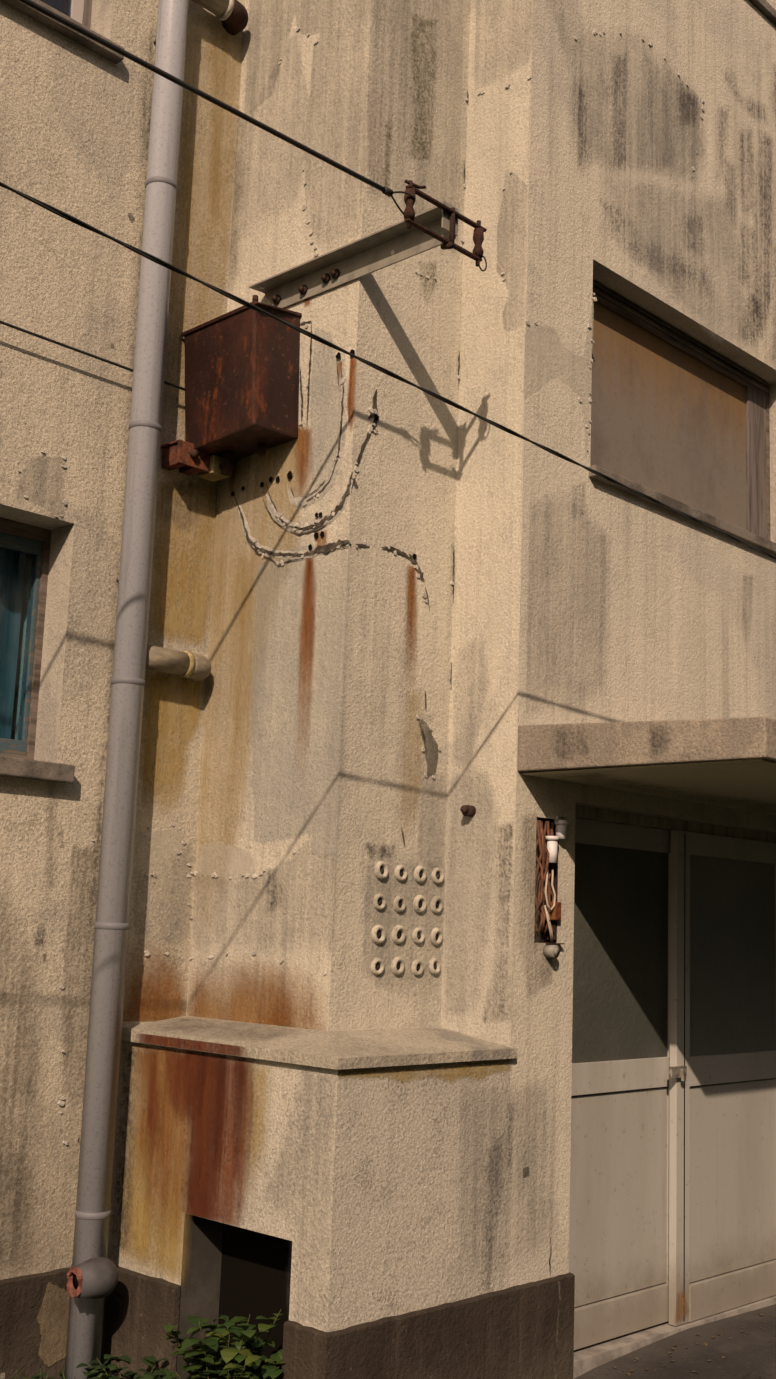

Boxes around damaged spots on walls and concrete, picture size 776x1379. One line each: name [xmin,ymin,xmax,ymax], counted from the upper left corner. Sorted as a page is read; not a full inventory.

water stain [731,133,771,339]
corrosion [338,356,356,425]
crack [455,354,463,385]
crack [231,320,455,609]
corrosion [300,533,325,671]
corrosion [408,567,416,631]
spalling [416,691,441,780]
corrosion [128,968,313,1224]